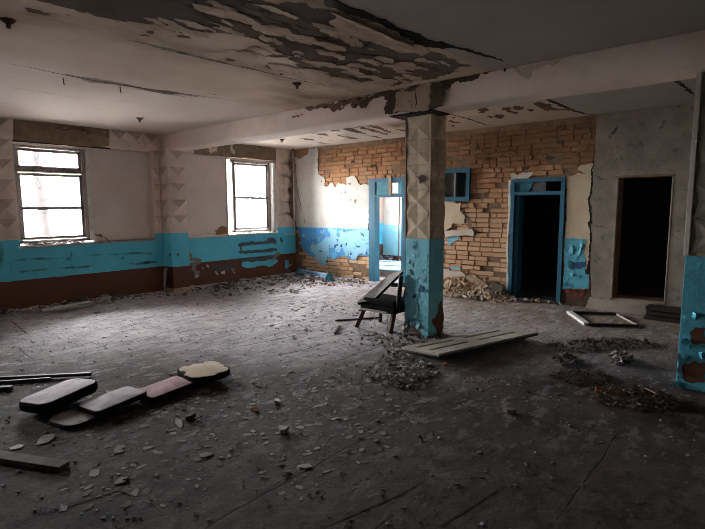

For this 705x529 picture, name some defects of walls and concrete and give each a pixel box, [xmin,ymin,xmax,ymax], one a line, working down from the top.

peeling [26,0,491,118]
peeling [477,102,570,119]
spalling [194,144,276,161]
spalling [300,120,405,203]
peeling [189,240,292,278]
peeling [295,227,369,280]
peeling [403,241,428,337]
spalling [432,299,444,334]
spalling [443,122,596,292]
peeling [563,238,591,307]
crack [585,150,605,286]
spalling [674,312,705,387]